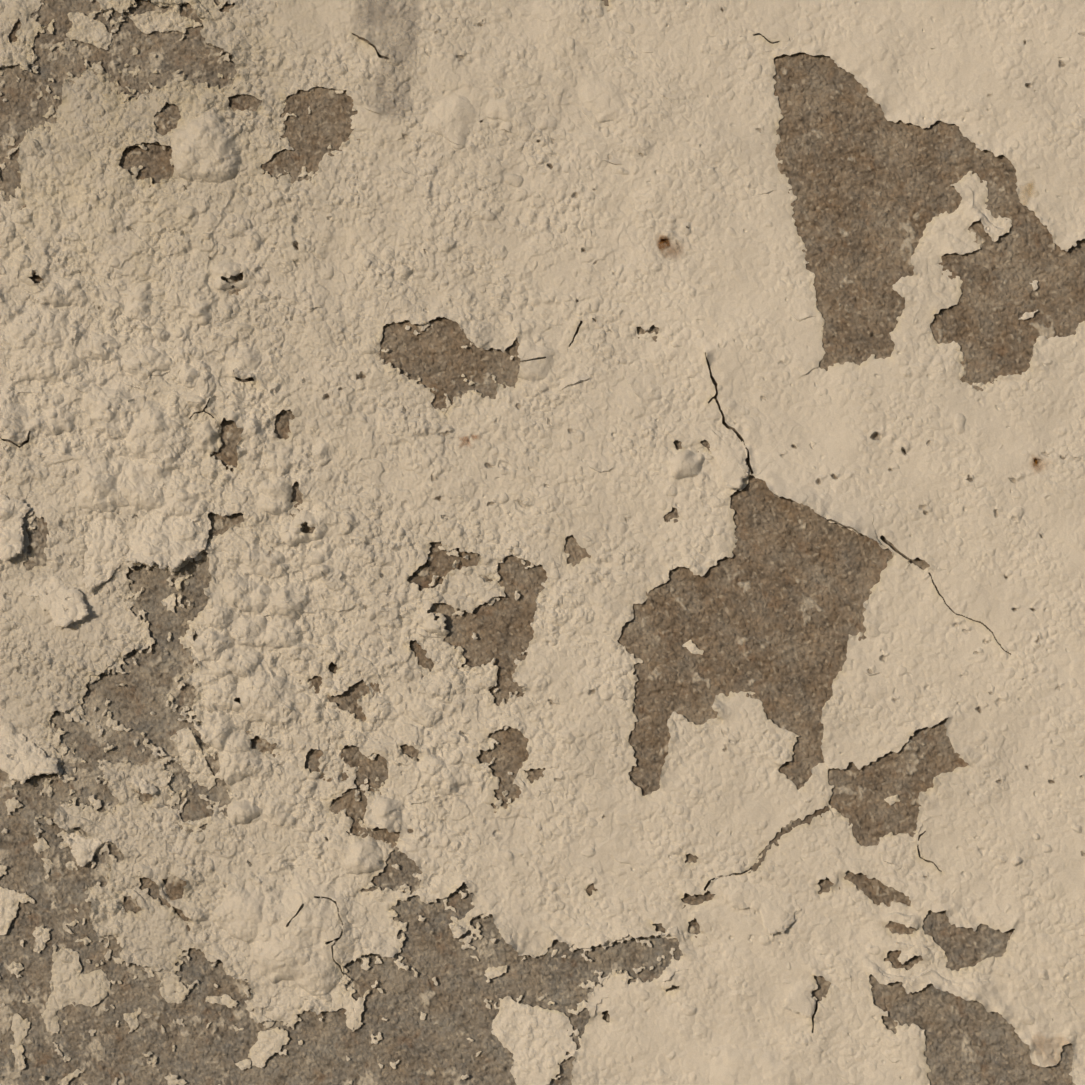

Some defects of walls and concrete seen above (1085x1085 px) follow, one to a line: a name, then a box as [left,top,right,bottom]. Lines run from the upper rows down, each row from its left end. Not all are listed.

peeling [0,0,270,210]
peeling [261,78,362,184]
peeling [773,45,1085,391]
peeling [375,311,526,412]
crack [705,352,753,476]
peeling [618,427,977,847]
crack [880,535,1011,655]
peeling [0,494,801,1085]
peeling [814,865,1082,1085]